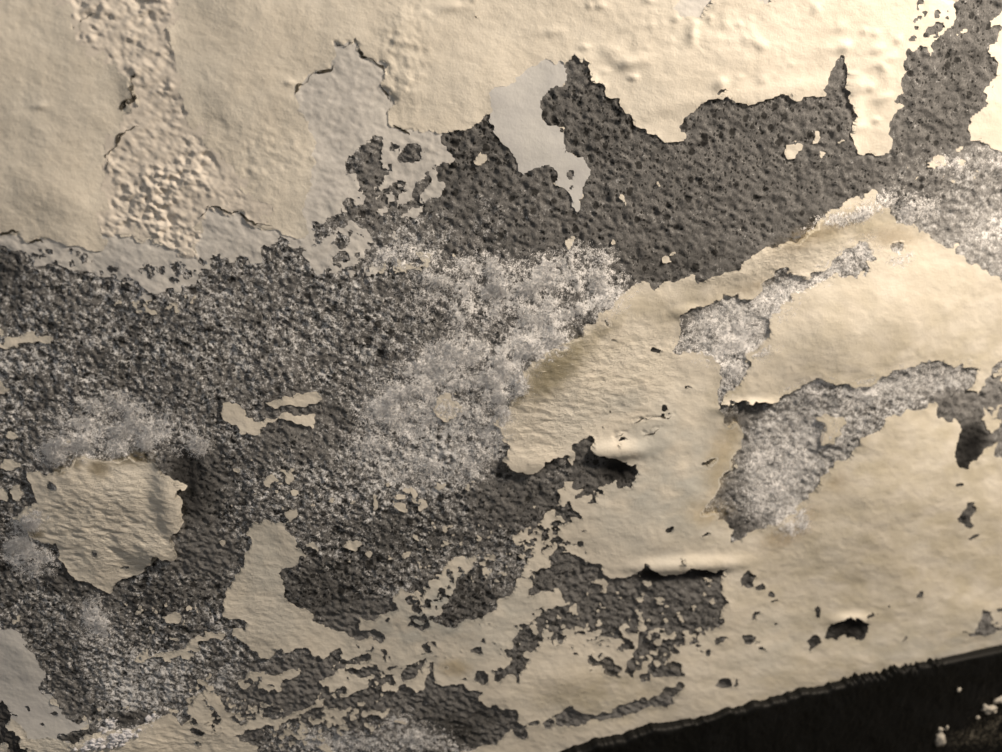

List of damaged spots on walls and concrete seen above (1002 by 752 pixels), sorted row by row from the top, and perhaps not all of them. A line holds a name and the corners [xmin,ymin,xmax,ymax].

crack [295,38,389,99]
crack [104,75,137,169]
peeling [0,0,1002,381]
crack [199,206,261,226]
peeling [651,241,1002,543]
peeling [0,135,729,752]
peeling [741,571,778,602]
peeling [742,635,763,650]
peeling [807,612,876,653]
peeling [962,608,1002,637]
peeling [715,678,738,688]